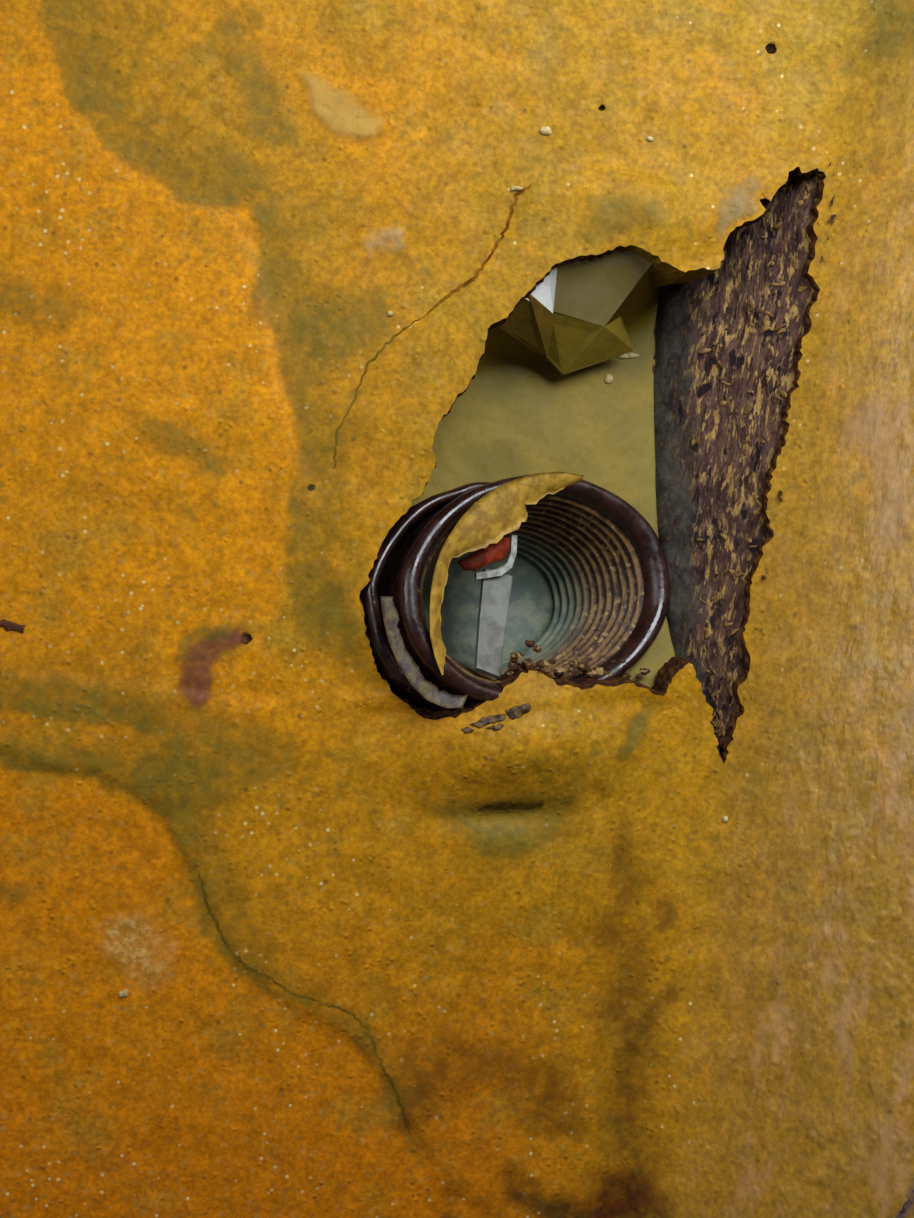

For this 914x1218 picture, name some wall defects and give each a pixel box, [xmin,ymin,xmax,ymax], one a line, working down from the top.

crack [333,184,531,469]
spalling [359,162,841,764]
crack [897,1190,914,1218]